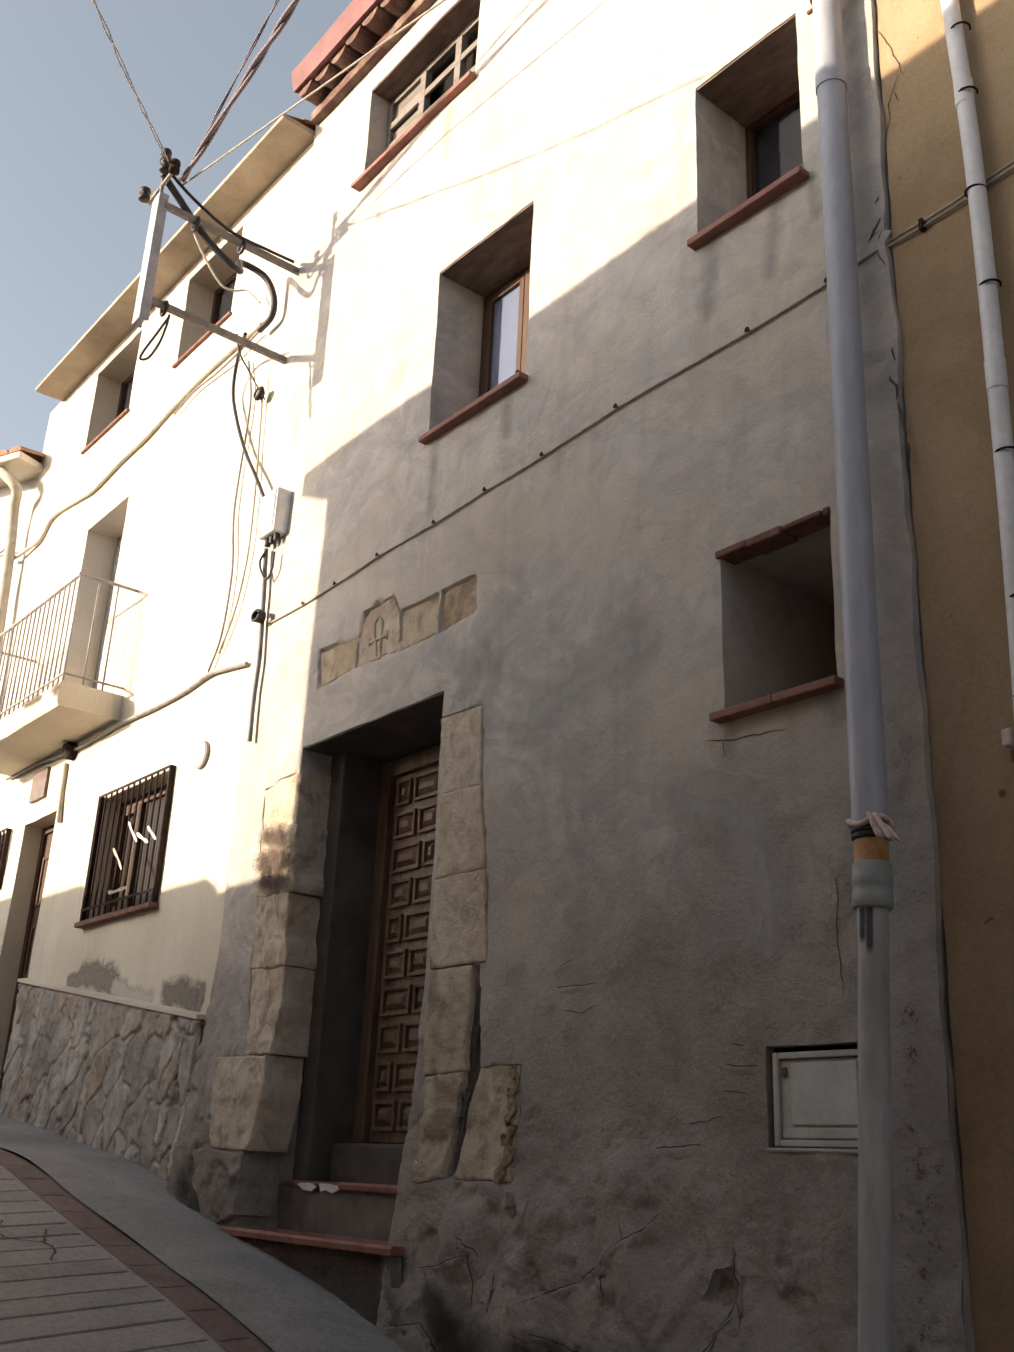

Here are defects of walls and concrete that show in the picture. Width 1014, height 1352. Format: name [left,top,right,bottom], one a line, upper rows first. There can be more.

crack [707,729,787,755]
crack [835,879,844,989]
crack [454,1214,661,1352]
spalling [696,1245,736,1306]
crack [703,1251,743,1352]